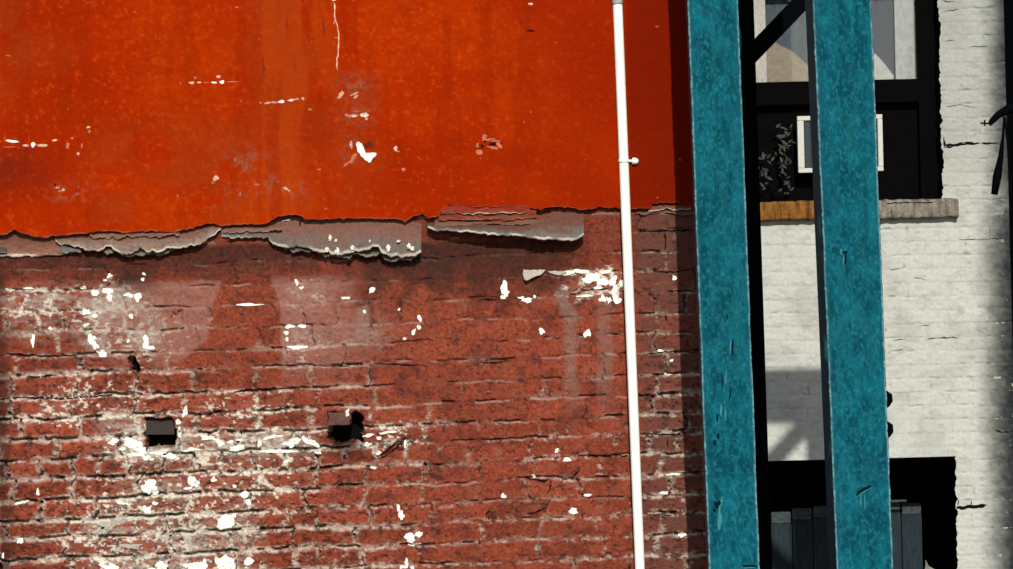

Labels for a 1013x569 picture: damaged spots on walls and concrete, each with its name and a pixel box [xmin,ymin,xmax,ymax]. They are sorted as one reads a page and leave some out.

spalling [344,141,377,167]
peeling [0,205,584,262]
peeling [81,273,142,303]
peeling [523,269,624,304]
peeling [82,309,107,357]
peeling [108,406,245,461]
peeling [257,435,321,463]
spalling [327,409,408,469]
peeling [141,479,159,514]
peeling [183,535,254,569]
peeling [217,513,247,544]
peeling [404,531,423,546]